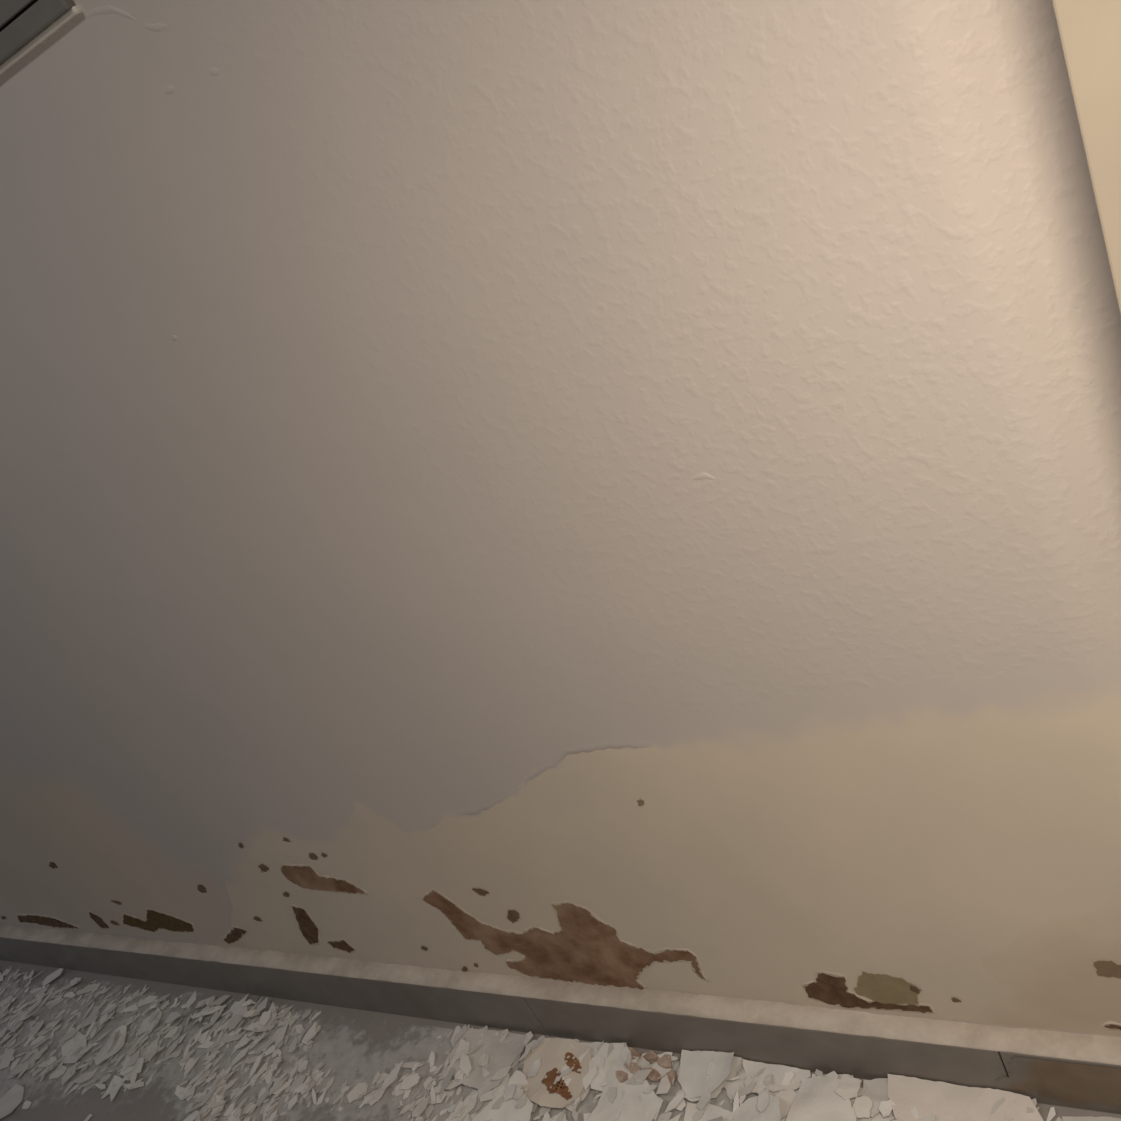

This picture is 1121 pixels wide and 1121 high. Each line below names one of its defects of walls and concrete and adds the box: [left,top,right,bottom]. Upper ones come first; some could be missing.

damp [0,742,247,947]
peeling [88,659,1121,1037]
flaking render [1,913,80,929]
damp [855,972,921,1005]
damp [937,893,1121,1035]